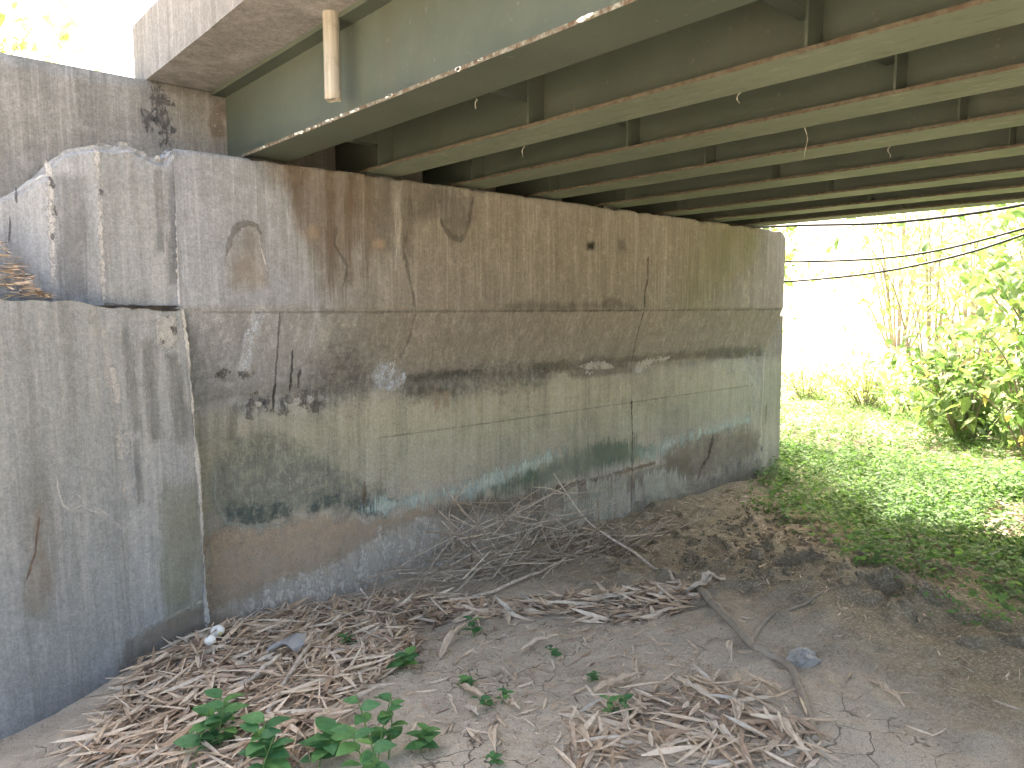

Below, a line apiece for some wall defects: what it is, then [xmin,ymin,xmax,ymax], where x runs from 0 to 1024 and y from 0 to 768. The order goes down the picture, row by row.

crack [631,258,649,364]
crack [272,313,280,412]
leakage [370,362,406,391]
crack [628,400,636,501]
leakage [561,414,751,527]
crack [699,436,714,476]